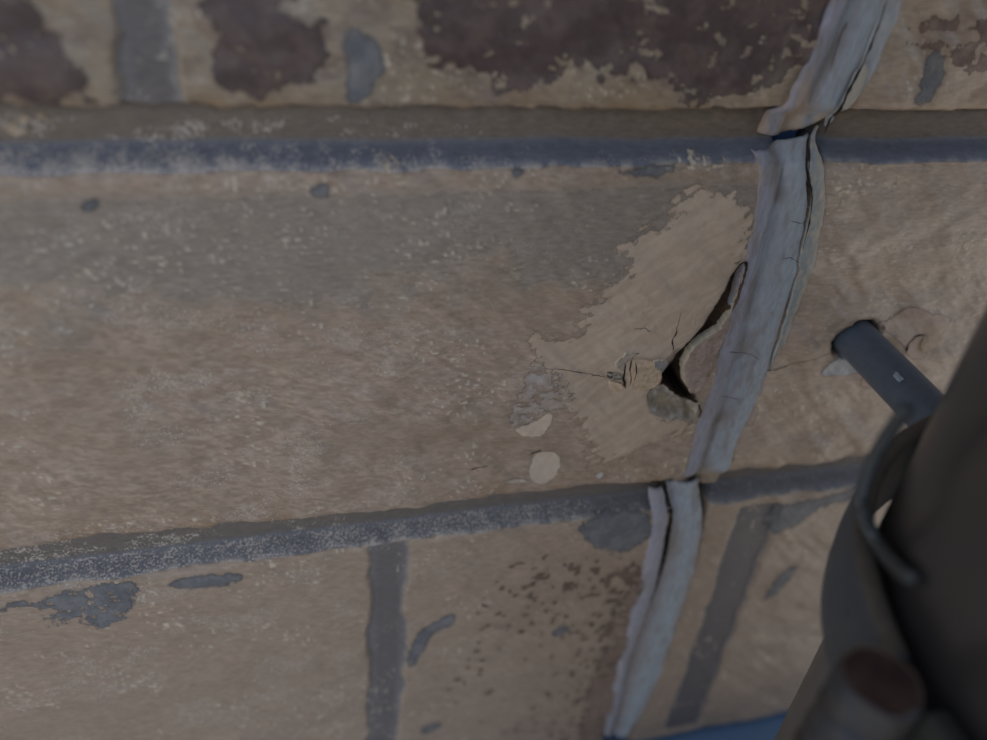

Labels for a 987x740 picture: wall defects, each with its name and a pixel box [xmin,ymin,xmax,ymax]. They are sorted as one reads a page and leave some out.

peeling [0,0,95,105]
peeling [196,0,330,101]
peeling [343,29,385,103]
peeling [415,0,830,108]
peeling [909,14,987,105]
peeling [508,184,755,479]
crack [540,262,830,420]